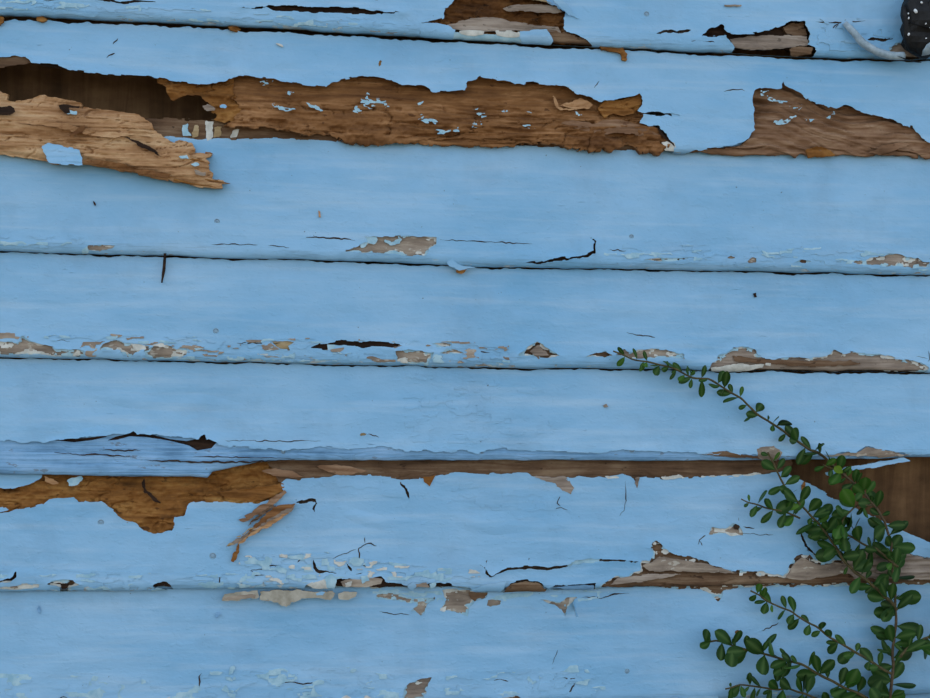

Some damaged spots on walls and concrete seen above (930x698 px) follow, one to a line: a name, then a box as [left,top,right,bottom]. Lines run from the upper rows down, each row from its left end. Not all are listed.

peeling [182,104,239,141]
peeling [353,92,389,113]
peeling [418,101,459,134]
peeling [761,90,814,125]
peeling [346,235,437,257]
peeling [0,333,559,366]
peeling [709,346,929,372]
crack [54,440,309,464]
peeling [0,433,796,489]
peeling [811,446,930,475]
peeling [806,498,930,563]
peeling [0,552,609,617]